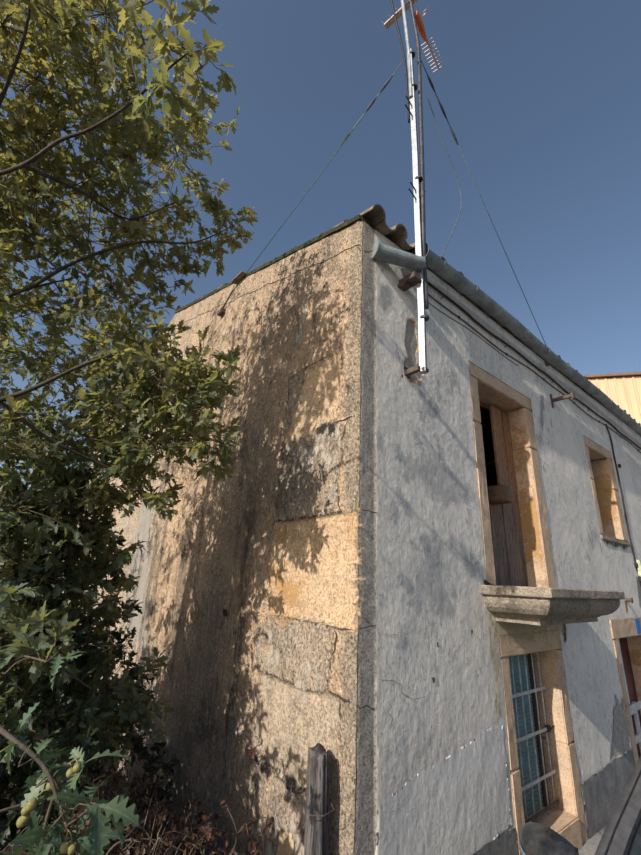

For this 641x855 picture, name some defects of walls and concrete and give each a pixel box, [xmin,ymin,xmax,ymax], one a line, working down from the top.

spalling [404,318,460,421]
peeling [391,430,474,524]
crack [256,615,425,726]
spalling [611,695,630,761]